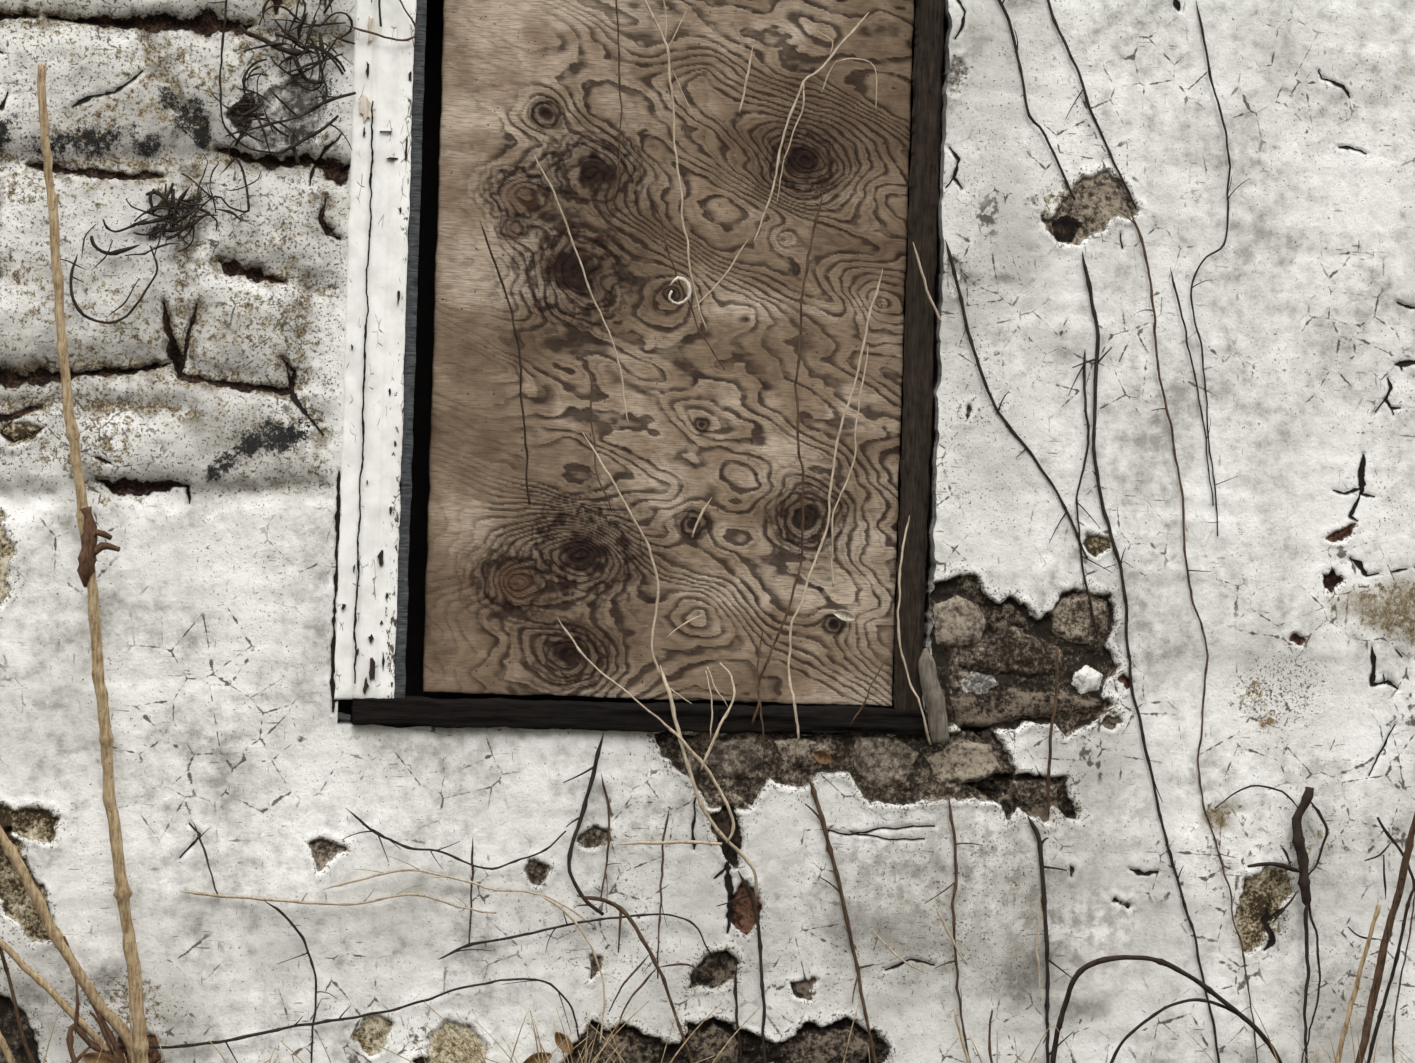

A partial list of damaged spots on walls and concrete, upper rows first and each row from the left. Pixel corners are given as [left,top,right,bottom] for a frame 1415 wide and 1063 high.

spalling [227,78,320,150]
spalling [1041,171,1138,245]
spalling [0,422,40,446]
spalling [0,512,15,605]
spalling [655,575,1130,935]
spalling [0,804,60,942]
spalling [565,1017,889,1063]